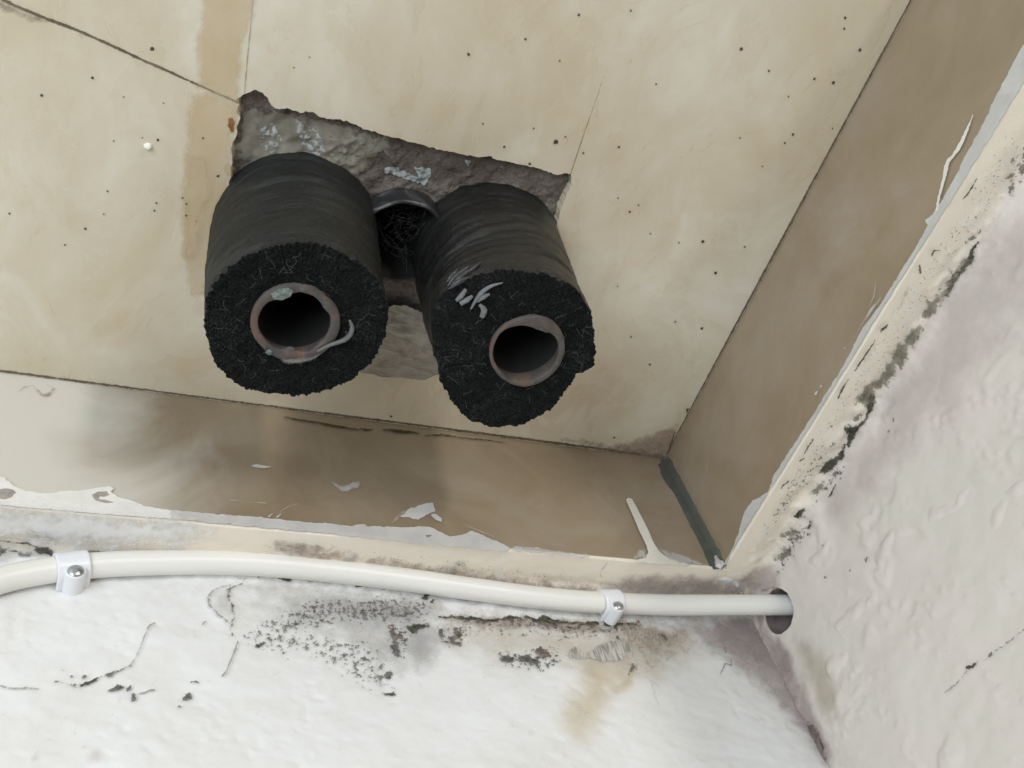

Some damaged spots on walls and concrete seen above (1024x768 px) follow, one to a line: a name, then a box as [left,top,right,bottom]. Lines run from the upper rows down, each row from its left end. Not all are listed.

leakage [544,137,1024,594]
peeling [0,477,171,519]
spalling [0,541,53,557]
leakage [280,545,354,562]
leakage [243,586,681,696]